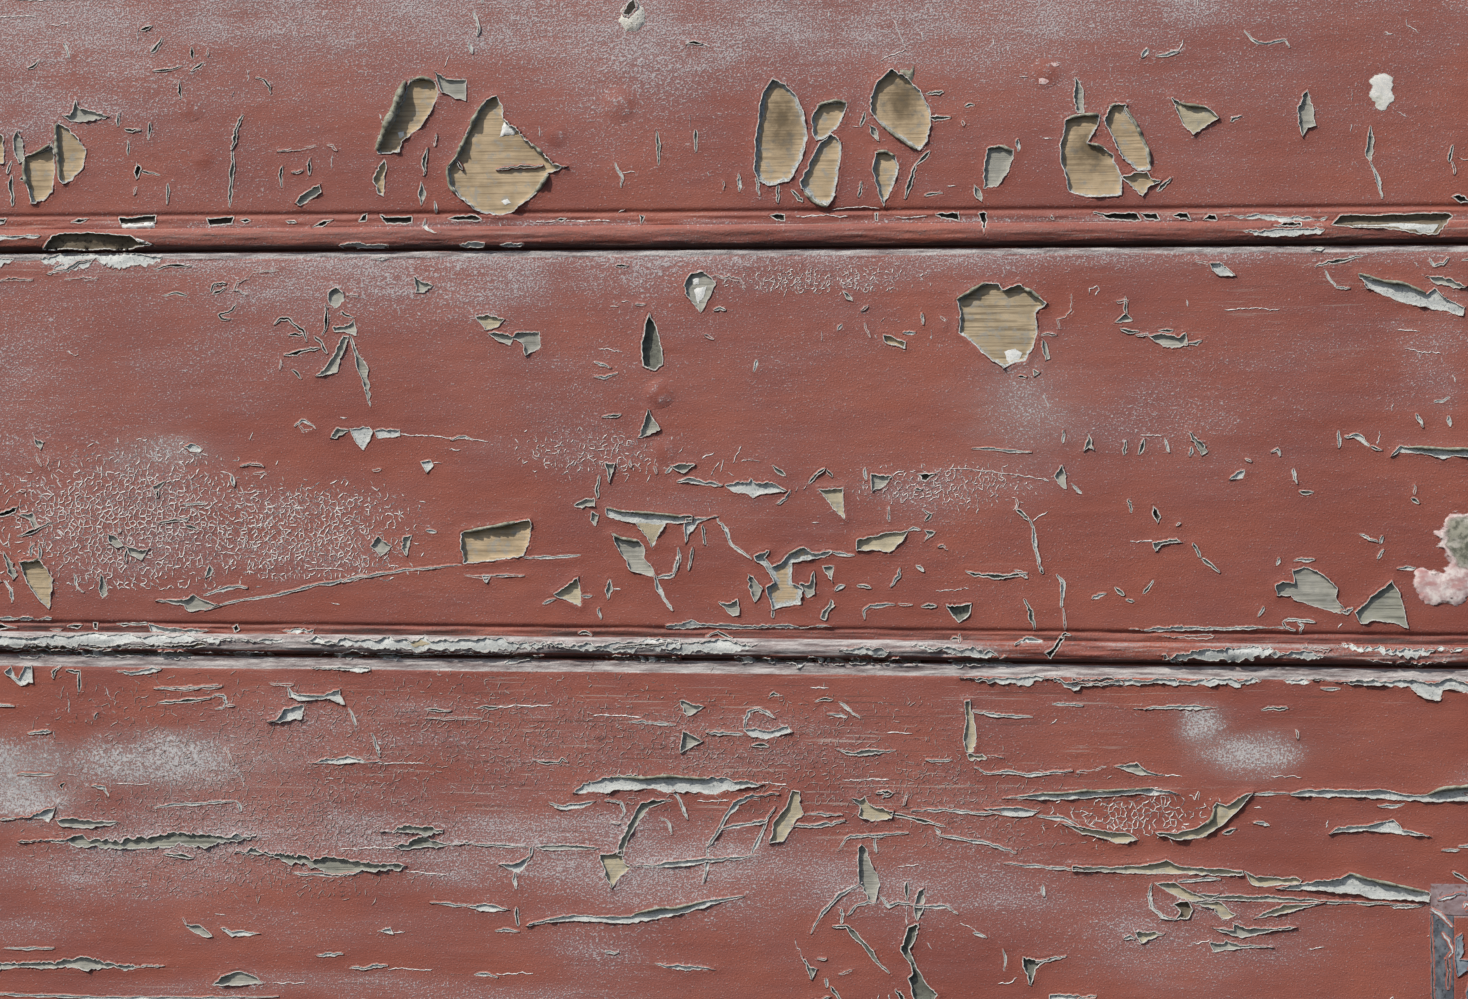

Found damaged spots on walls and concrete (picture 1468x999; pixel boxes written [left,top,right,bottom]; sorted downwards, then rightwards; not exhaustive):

peeling [0,99,110,205]
peeling [371,71,568,217]
peeling [752,77,848,208]
peeling [868,64,933,208]
peeling [1058,76,1162,199]
peeling [273,285,488,452]
peeling [956,281,1048,378]
peeling [1357,273,1468,317]
peeling [724,476,788,500]
peeling [817,486,847,521]
peeling [0,496,1468,764]
peeling [0,761,1468,999]